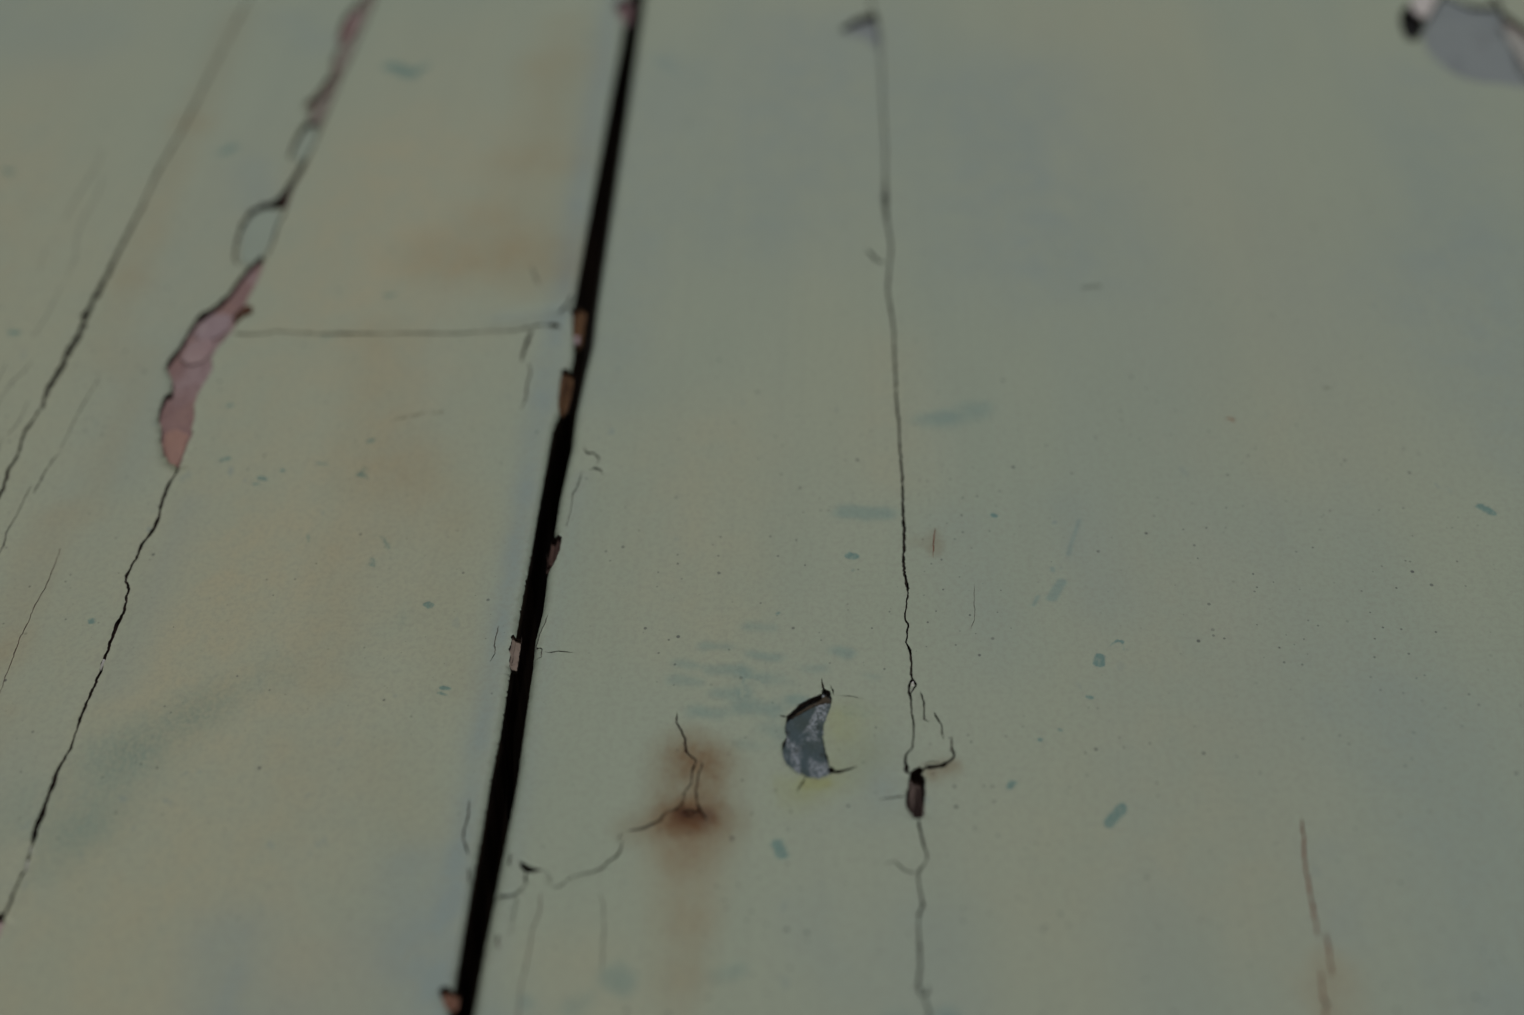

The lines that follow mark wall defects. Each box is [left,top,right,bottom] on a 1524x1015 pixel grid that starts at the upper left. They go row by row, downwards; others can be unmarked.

peeling [305,0,375,138]
peeling [1400,0,1524,87]
crack [0,0,248,552]
peeling [158,256,264,470]
peeling [269,158,307,211]
crack [232,323,560,408]
crack [867,0,955,1015]
crack [0,468,179,922]
crack [463,714,708,919]
peeling [780,680,863,793]
crack [1301,818,1333,1015]